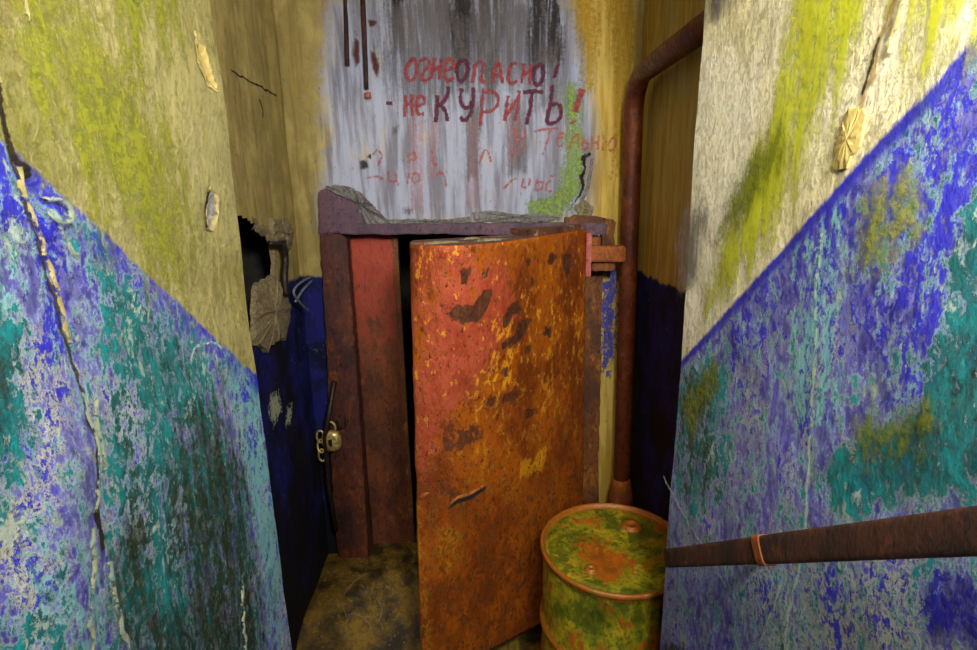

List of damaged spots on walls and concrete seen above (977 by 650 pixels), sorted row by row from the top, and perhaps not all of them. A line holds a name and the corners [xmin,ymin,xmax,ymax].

water stain [384,0,562,179]
water stain [576,0,633,175]
crack [859,0,905,110]
crack [0,73,105,552]